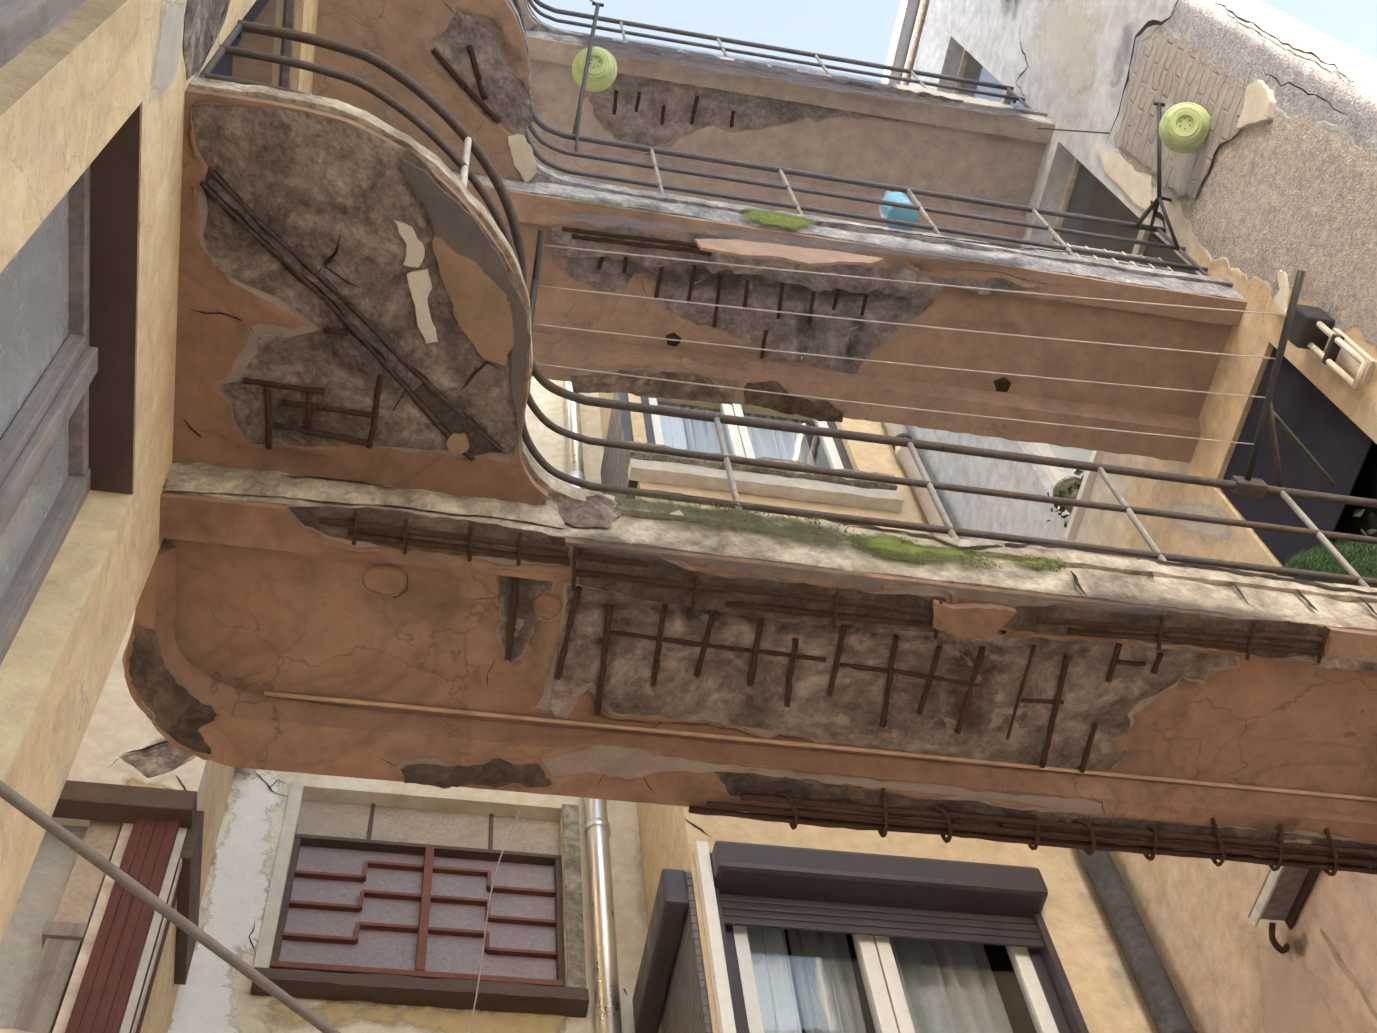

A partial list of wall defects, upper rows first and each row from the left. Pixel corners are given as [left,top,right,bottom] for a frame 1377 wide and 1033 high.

spalling [181,0,231,88]
spalling [417,0,537,183]
spalling [572,73,904,159]
spalling [821,79,964,104]
spalling [1097,0,1377,379]
spalling [165,101,1377,773]
spalling [107,626,230,785]
spalling [376,743,1377,876]
water stain [271,1003,566,1033]